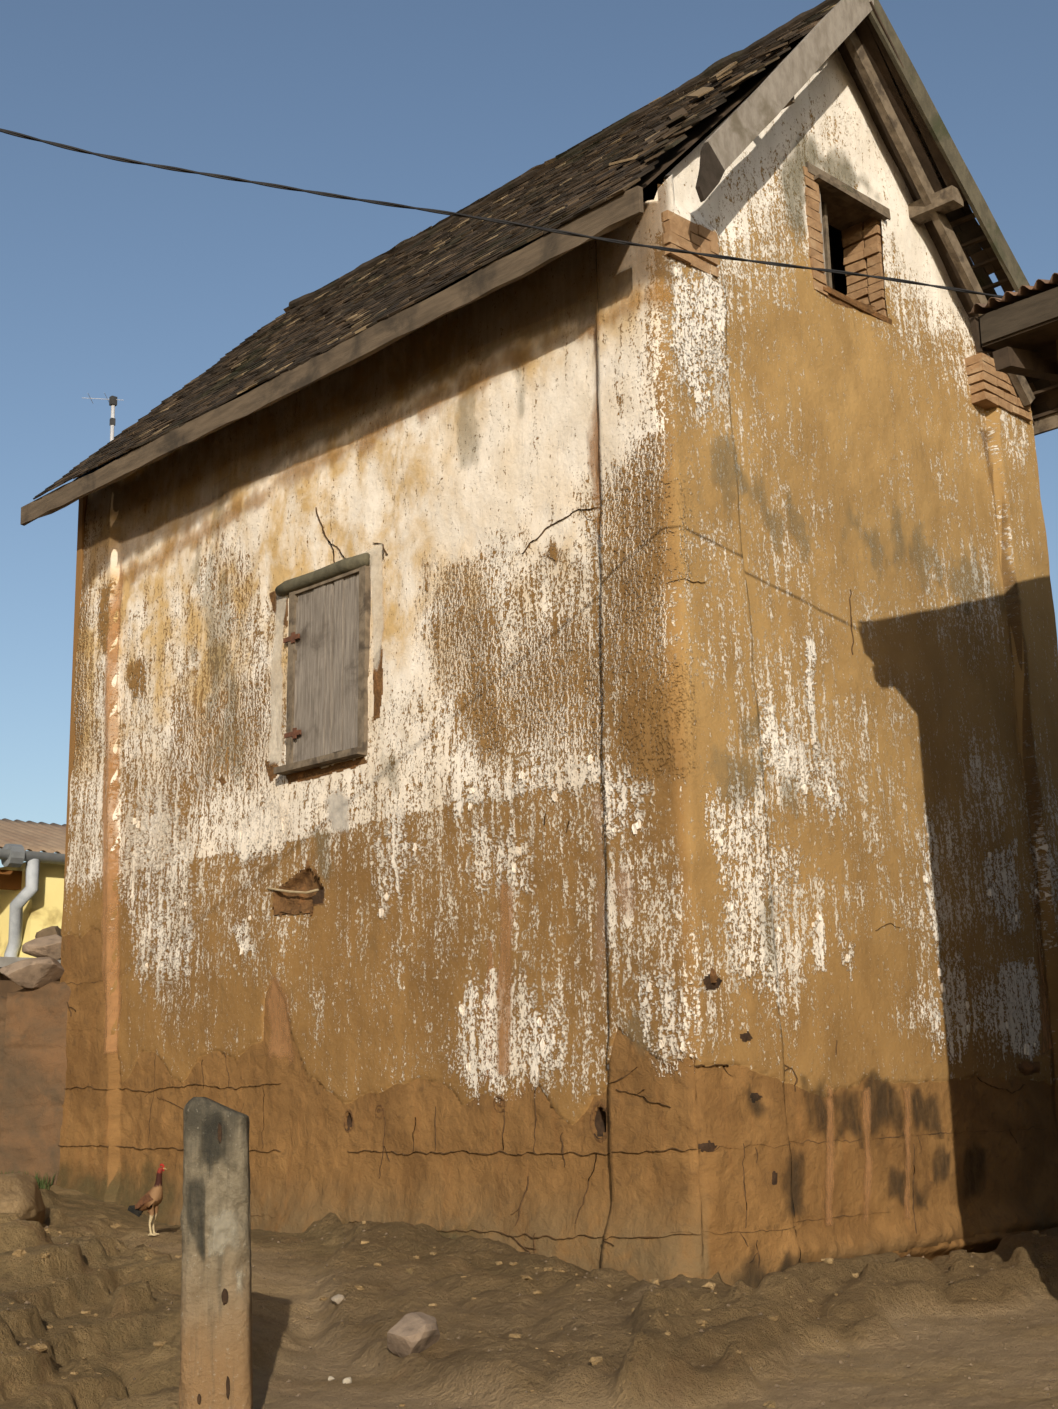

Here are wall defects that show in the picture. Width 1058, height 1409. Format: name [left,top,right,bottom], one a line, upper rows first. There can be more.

peeling [654,257,729,418]
crack [315,507,388,563]
crack [521,507,598,554]
flaking render [373,647,383,721]
peeling [414,431,705,898]
peeling [118,664,367,993]
peeling [633,636,857,1077]
crack [58,1053,281,1152]
peeling [443,966,568,1113]
crack [608,1067,671,1108]
crack [347,1084,1047,1268]
crack [690,1064,731,1076]